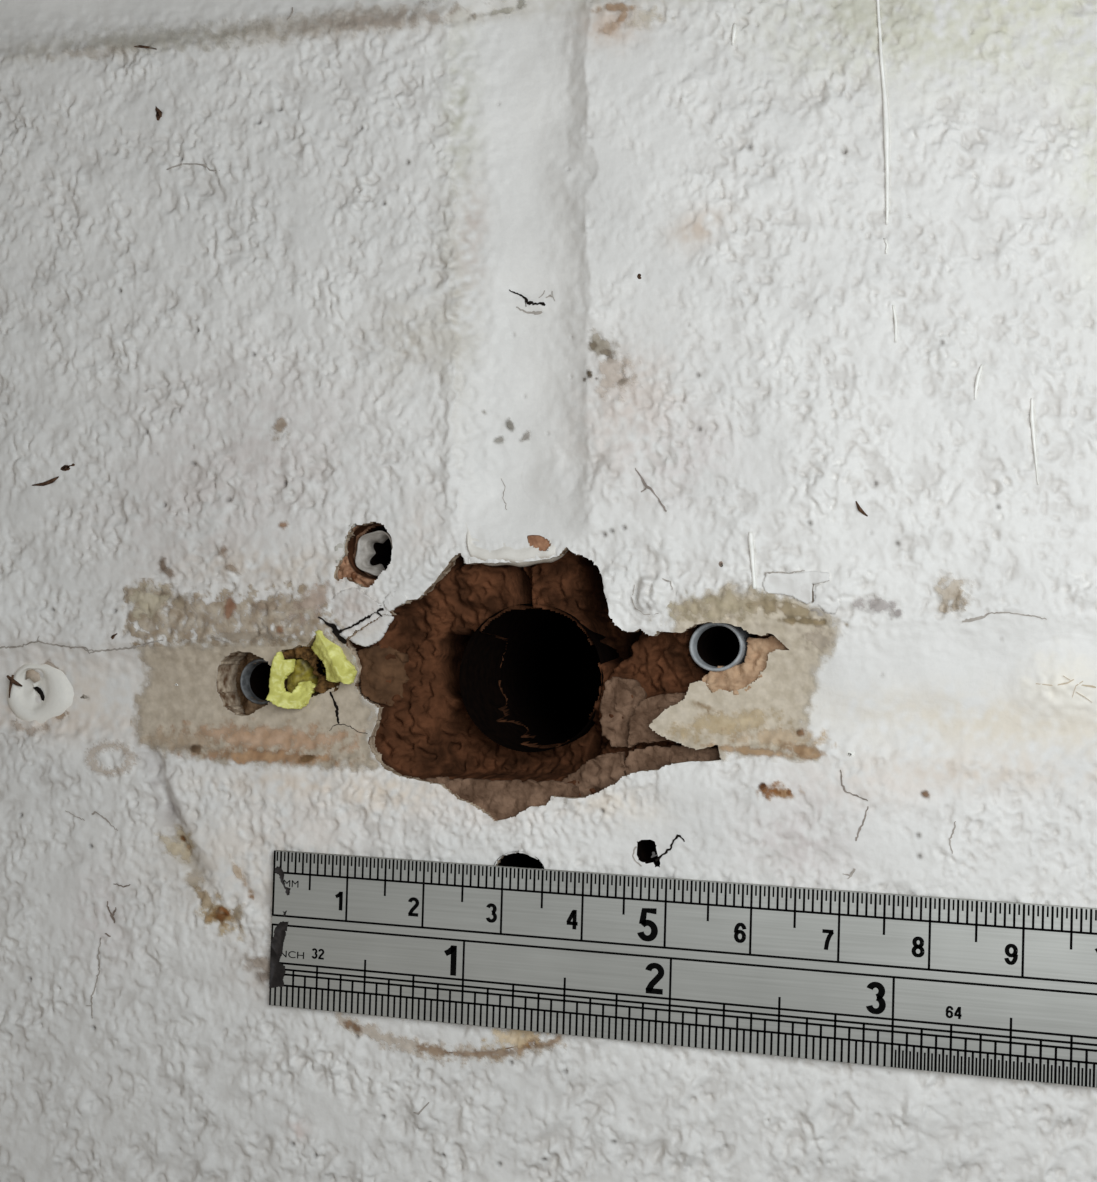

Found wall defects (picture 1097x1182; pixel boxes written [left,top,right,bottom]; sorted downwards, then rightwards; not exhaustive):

crack [0,636,163,654]
spalling [123,525,840,822]